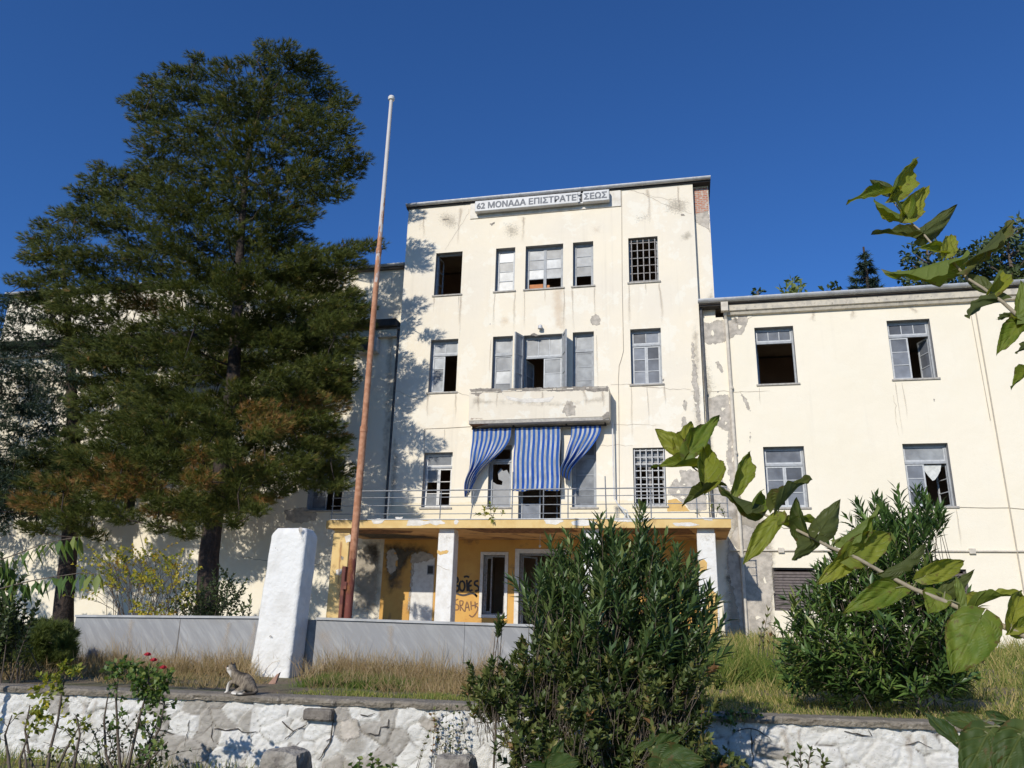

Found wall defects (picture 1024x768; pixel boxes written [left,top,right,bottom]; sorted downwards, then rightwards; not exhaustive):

spalling [470,386,608,416]
peeling [614,315,775,638]
spalling [345,517,596,543]
damp [356,534,438,610]
peeling [386,549,448,610]